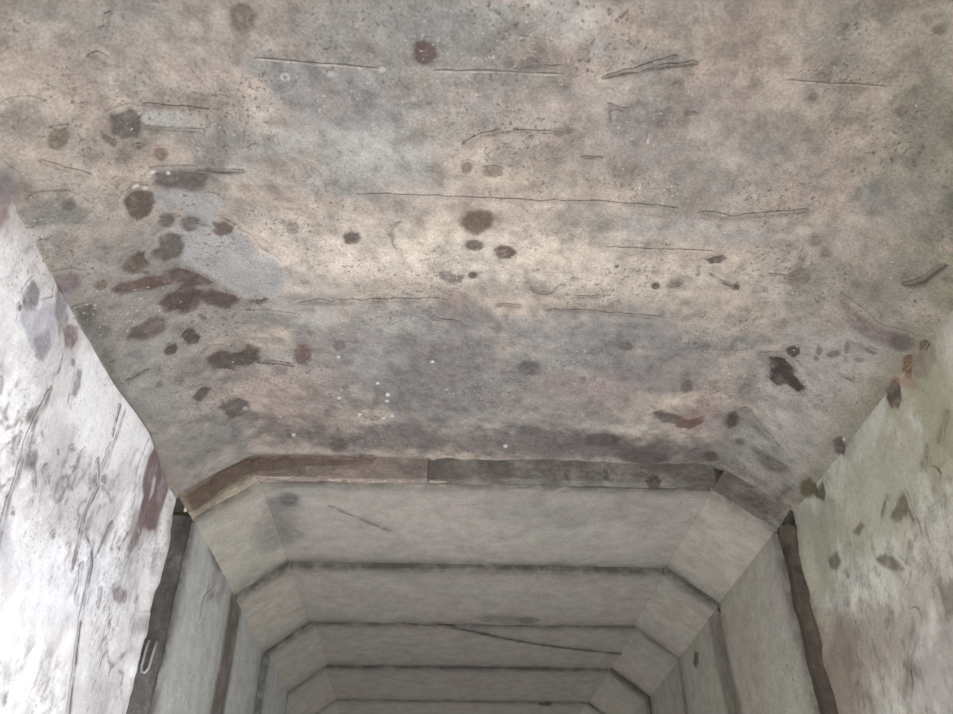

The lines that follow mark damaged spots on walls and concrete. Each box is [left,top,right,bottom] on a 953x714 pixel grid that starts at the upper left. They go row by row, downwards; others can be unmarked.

water stain [865,0,953,19]
rust [0,158,25,235]
water stain [812,295,919,364]
water stain [68,357,84,410]
water stain [73,302,134,404]
water stain [513,357,544,378]
water stain [577,431,673,464]
mould [723,409,748,447]
mould [829,433,848,459]
rust [125,433,374,557]
mould [793,472,829,509]
crack [403,621,622,656]